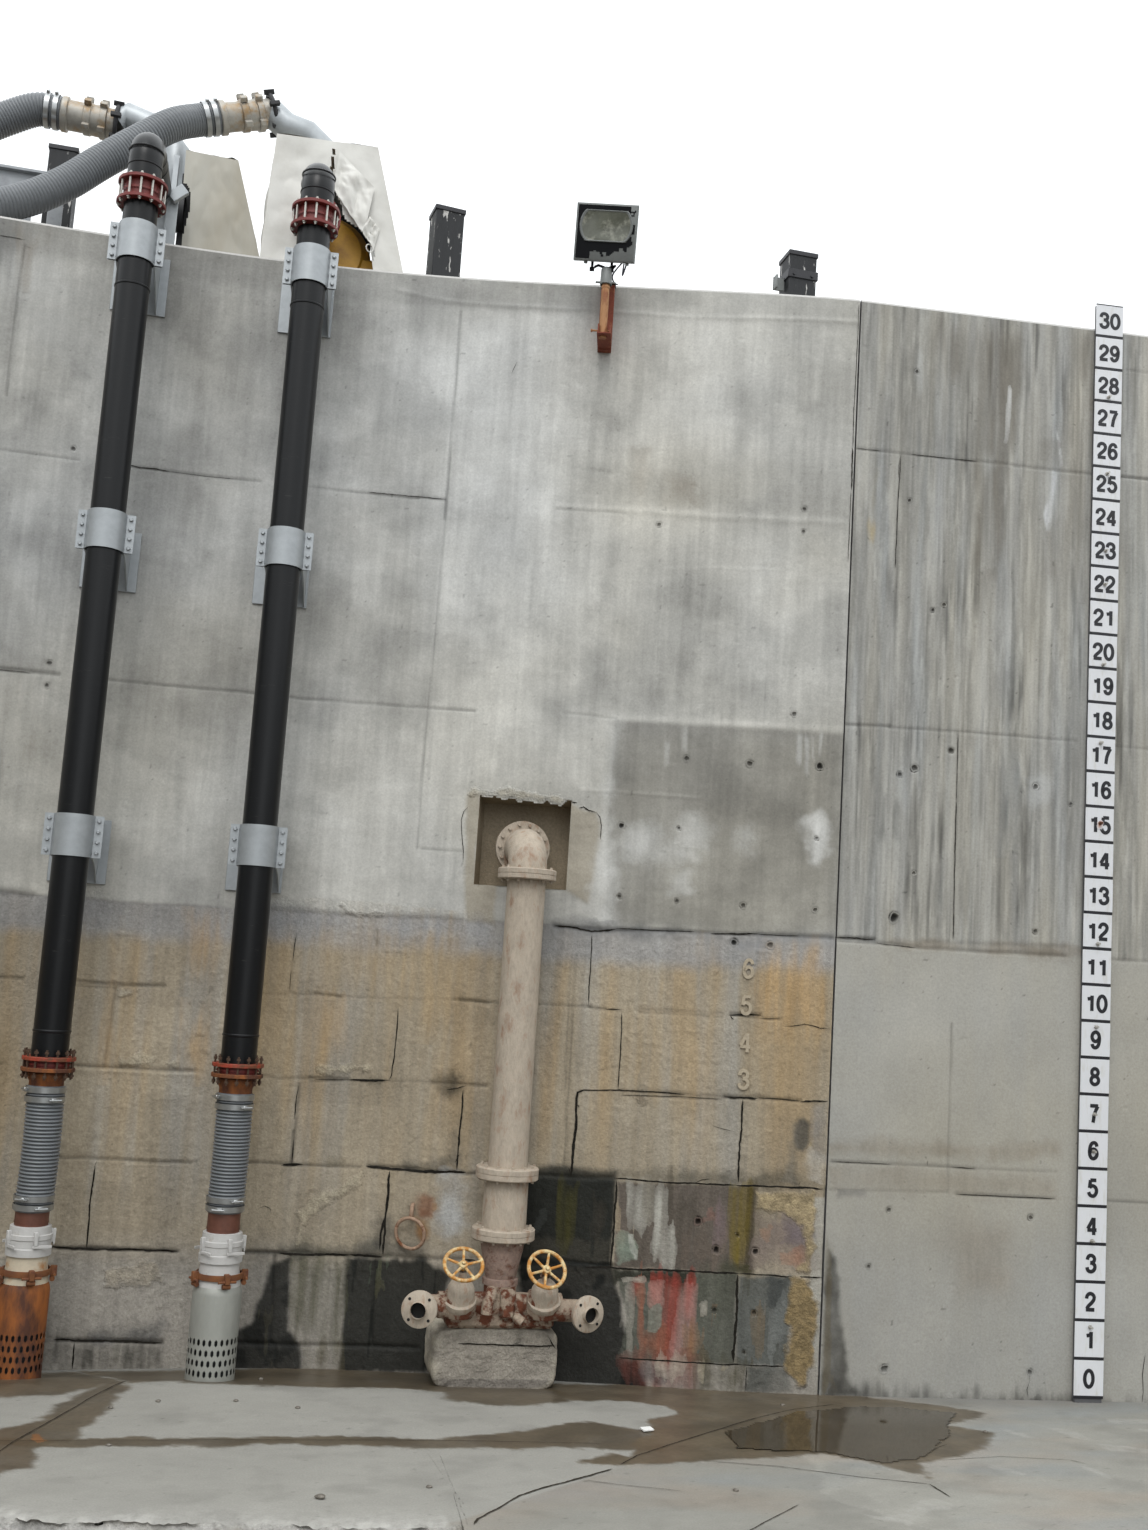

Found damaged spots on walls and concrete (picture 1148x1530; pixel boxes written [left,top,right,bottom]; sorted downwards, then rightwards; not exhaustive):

water stain [543,402,838,957]
peeling [614,1164,718,1358]
peeling [702,1193,728,1256]
peeling [747,1189,823,1390]